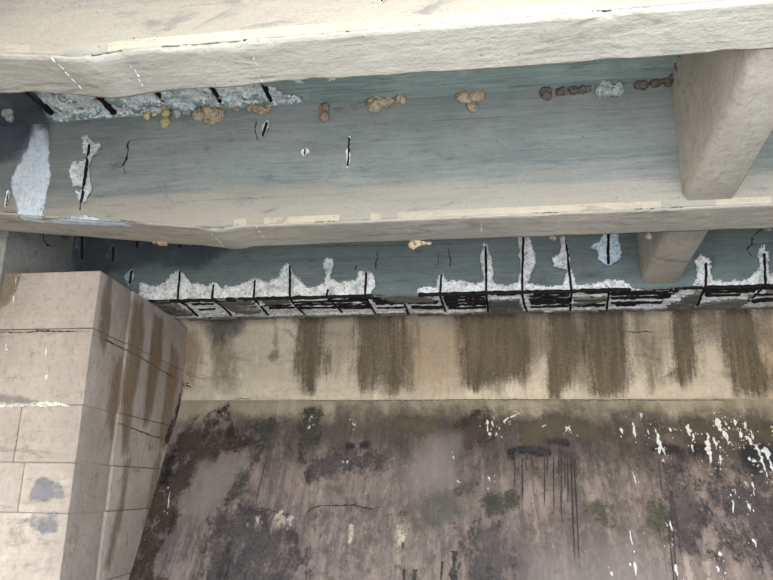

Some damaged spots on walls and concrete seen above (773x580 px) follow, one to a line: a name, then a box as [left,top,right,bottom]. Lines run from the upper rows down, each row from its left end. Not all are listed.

water stain [0,91,48,161]
spalling [24,83,302,122]
spalling [69,135,101,210]
spalling [125,234,773,321]
water stain [209,317,241,378]
water stain [294,317,331,395]
water stain [353,314,420,394]
water stain [460,313,530,392]
water stain [547,310,632,399]
water stain [671,309,773,398]
water stain [129,391,773,580]